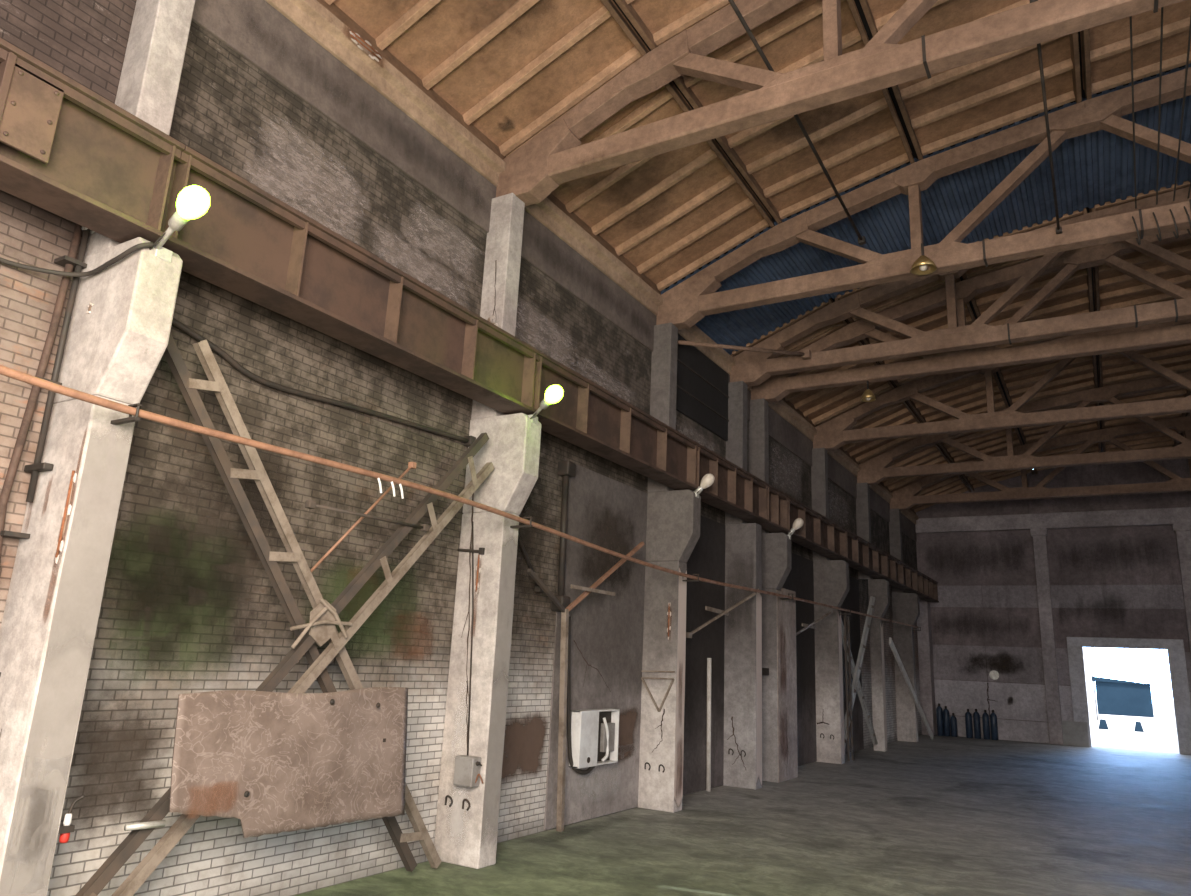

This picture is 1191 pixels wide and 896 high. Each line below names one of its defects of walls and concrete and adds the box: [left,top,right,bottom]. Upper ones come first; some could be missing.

leakage [0,430,131,896]